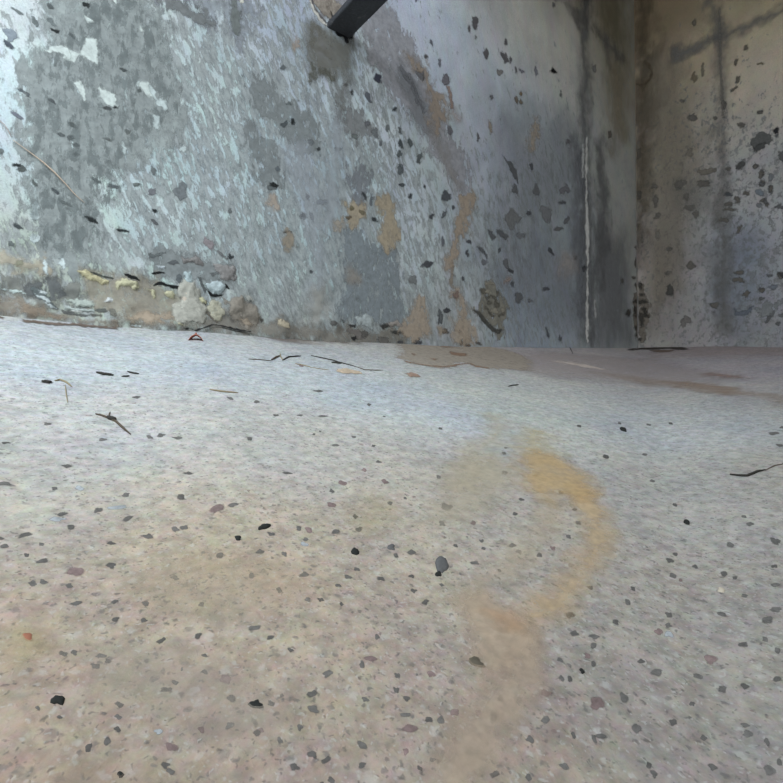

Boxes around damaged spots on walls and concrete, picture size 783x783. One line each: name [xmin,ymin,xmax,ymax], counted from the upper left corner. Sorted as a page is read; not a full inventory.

peeling [2,28,17,49]
peeling [497,39,524,76]
water stain [672,8,783,117]
peeling [11,0,262,298]
peeling [240,70,320,192]
peeling [346,159,373,206]
peeling [335,92,413,187]
spalling [429,190,455,219]
water stain [573,0,625,343]
water stain [635,0,689,300]
spalling [3,287,116,317]
peeling [331,226,417,343]